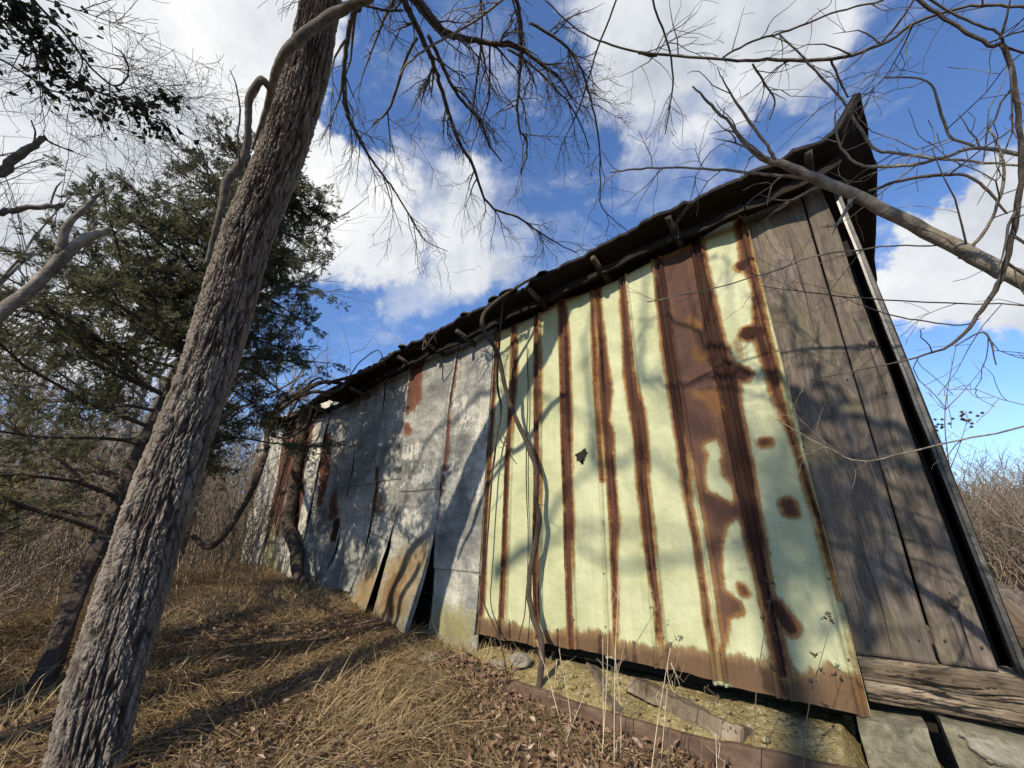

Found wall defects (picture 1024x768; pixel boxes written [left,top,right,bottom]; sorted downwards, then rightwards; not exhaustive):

corrosion [264,411,340,553]
corrosion [404,359,426,435]
corrosion [474,215,871,717]